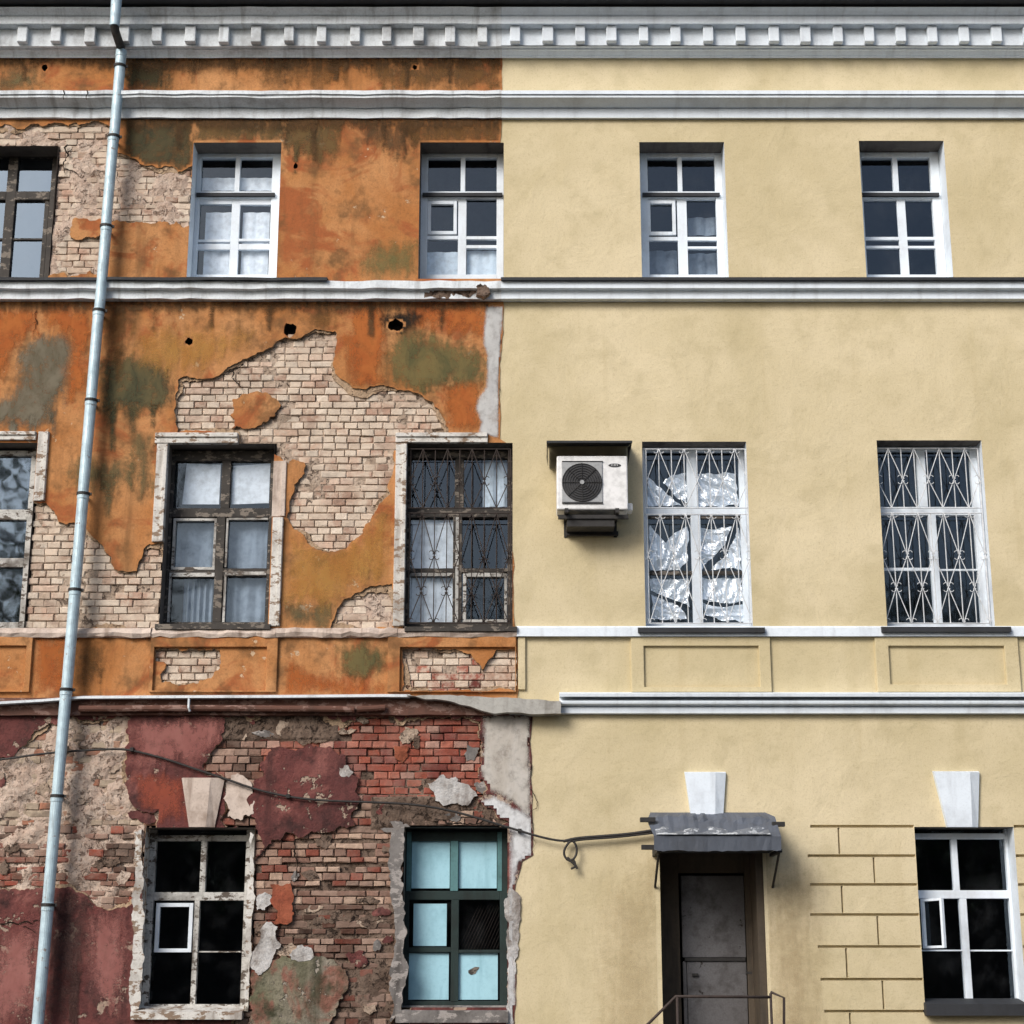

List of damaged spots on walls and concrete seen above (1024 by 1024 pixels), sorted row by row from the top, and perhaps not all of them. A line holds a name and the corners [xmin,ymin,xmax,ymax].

flaking render [0,120,193,277]
water stain [68,407,154,513]
flaking render [174,284,503,552]
flaking render [25,501,163,628]
flaking render [155,648,221,686]
flaking render [330,584,393,628]
flaking render [402,648,518,691]
flaking render [0,716,531,1024]